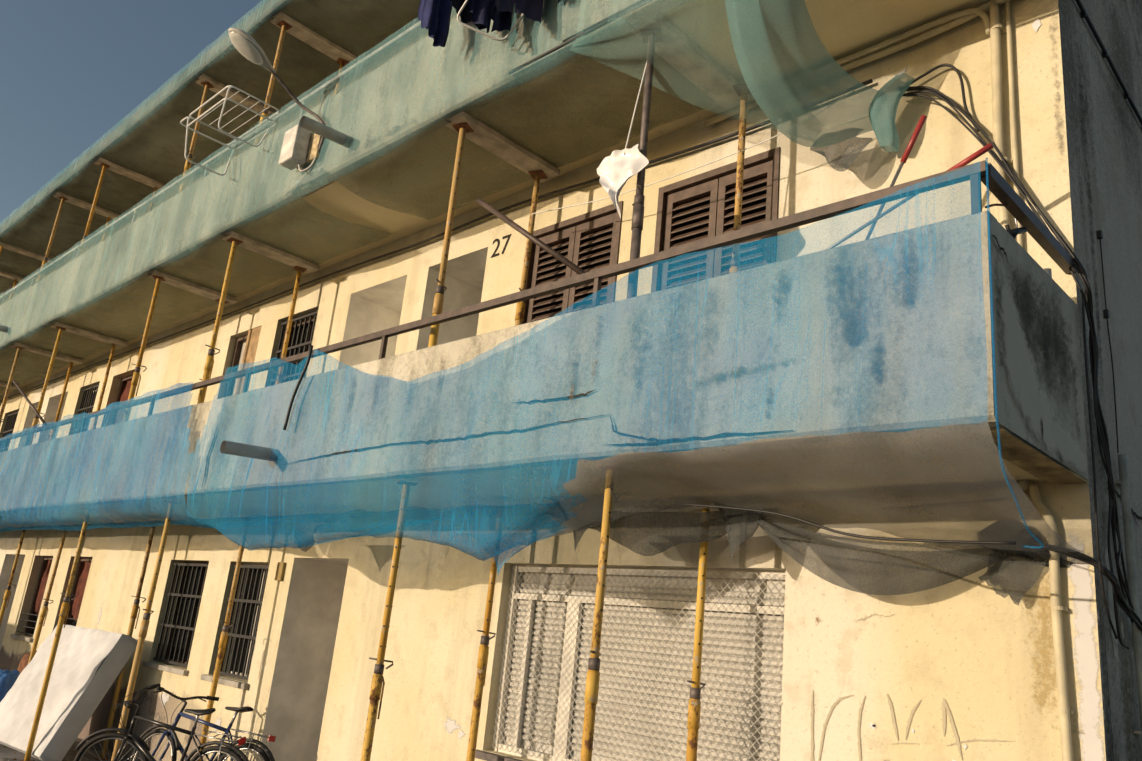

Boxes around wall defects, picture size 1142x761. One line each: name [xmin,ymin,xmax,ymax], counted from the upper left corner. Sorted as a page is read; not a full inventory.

leakage [996,260,1077,399]
crack [1107,482,1142,526]